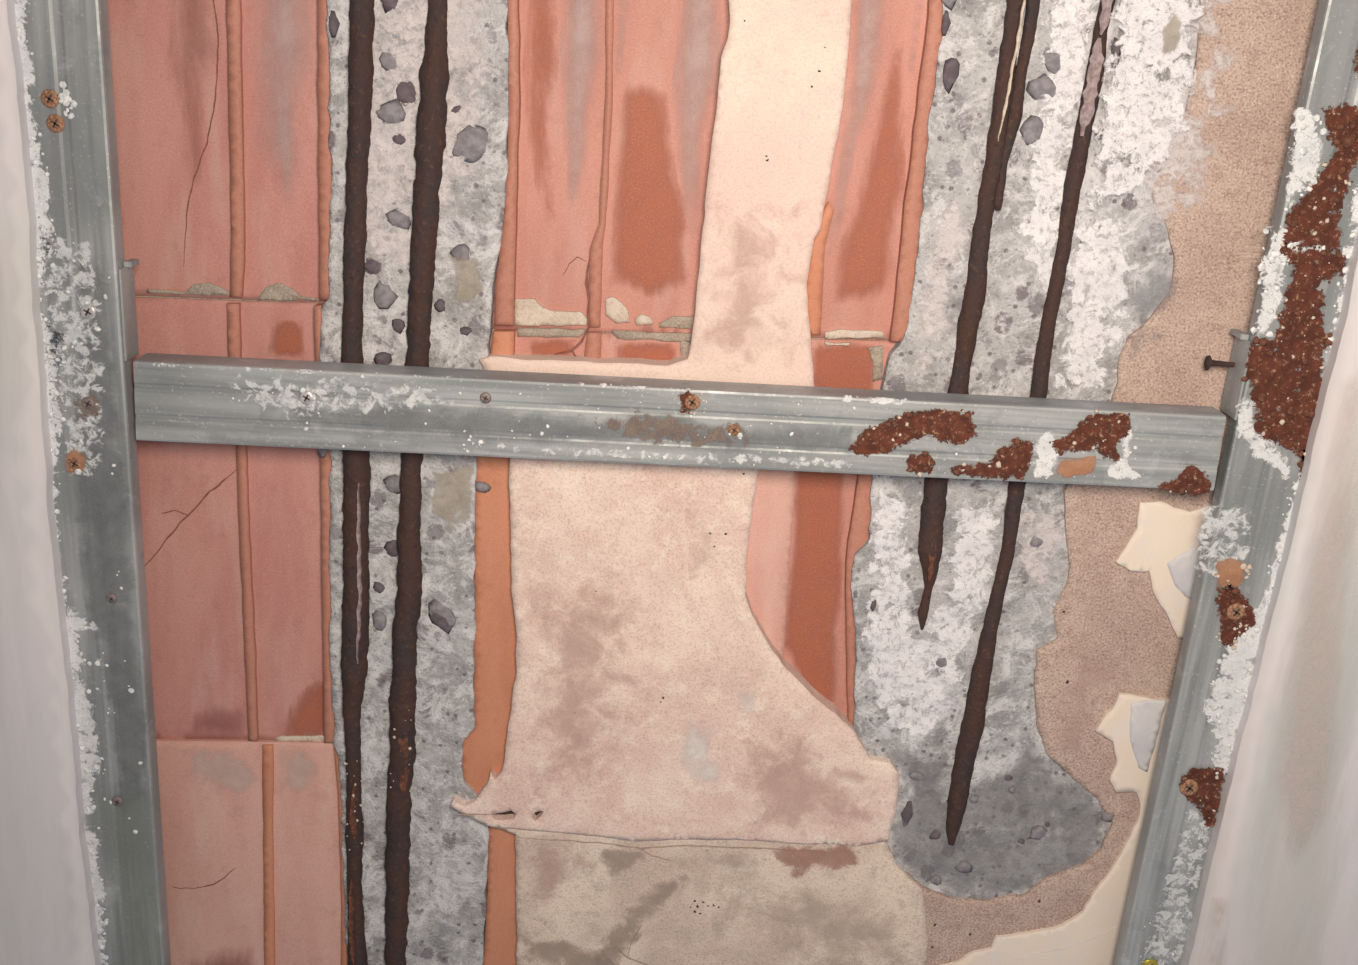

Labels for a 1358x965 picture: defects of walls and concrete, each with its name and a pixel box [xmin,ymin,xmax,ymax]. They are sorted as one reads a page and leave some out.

crack [183,0,219,267]
spalling [259,0,350,363]
rust [341,0,375,364]
rust [404,0,450,367]
damp [617,92,682,291]
damp [683,0,713,173]
damp [1015,0,1235,389]
crack [145,469,237,566]
peeling [405,0,1319,965]
rust [848,0,1040,845]
crack [172,869,234,889]
spalling [318,449,401,965]